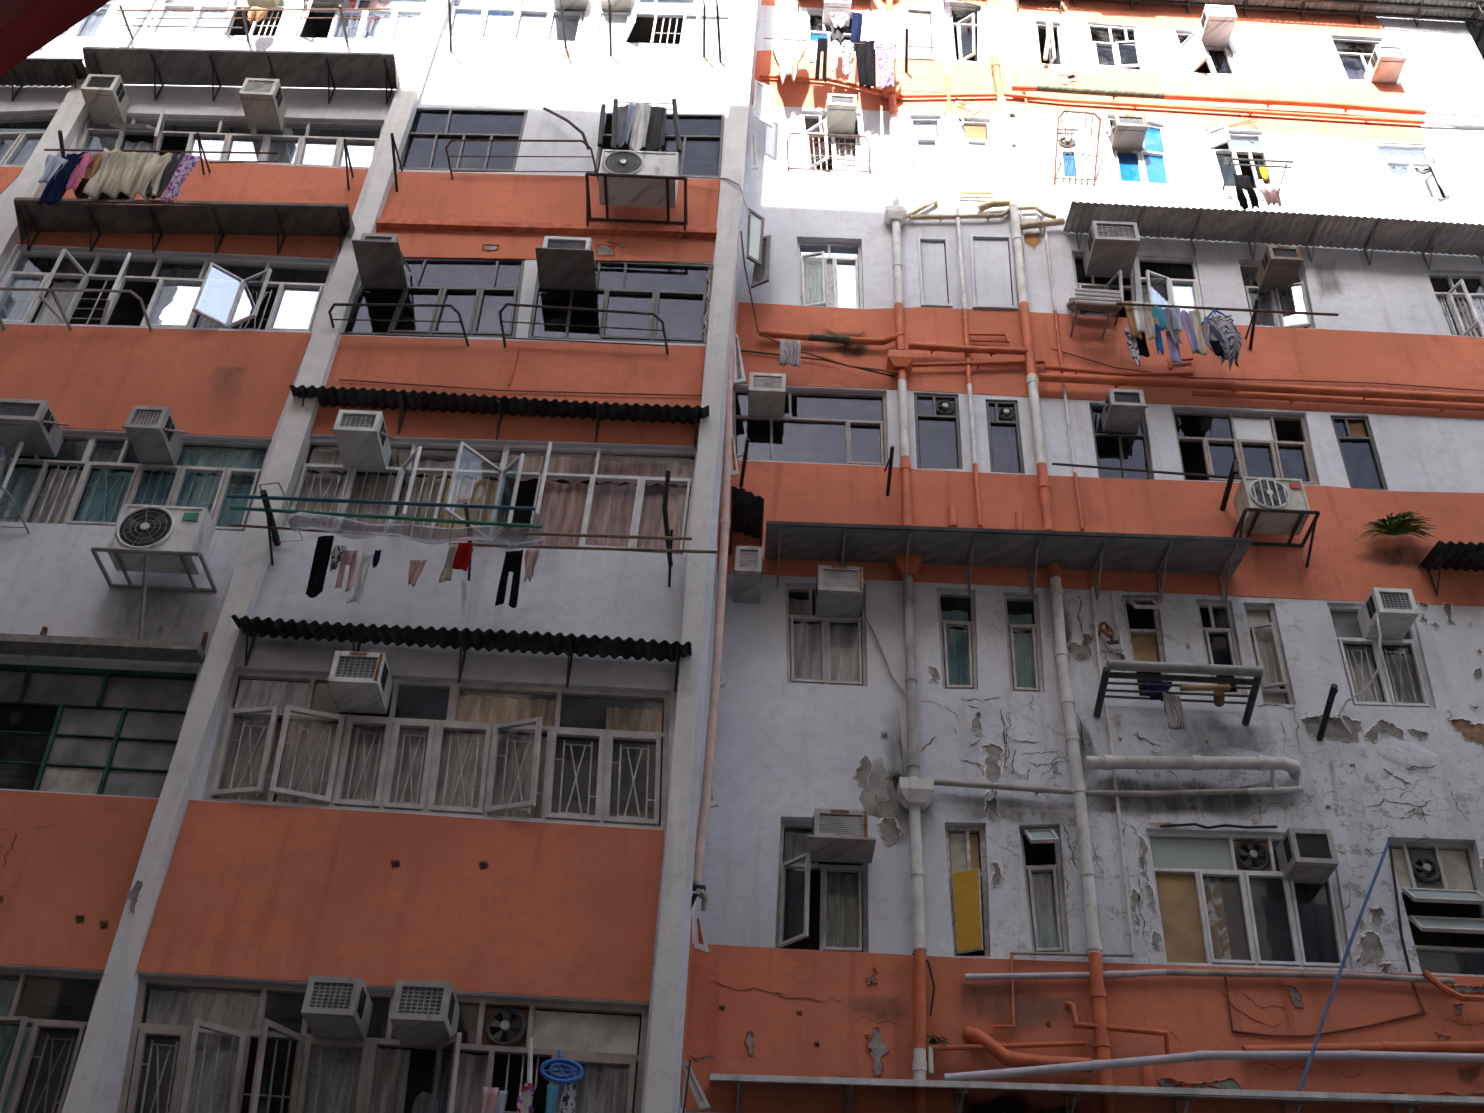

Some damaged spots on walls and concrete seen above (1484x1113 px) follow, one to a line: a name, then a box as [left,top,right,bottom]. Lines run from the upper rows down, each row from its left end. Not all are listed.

peeling [1007,113,1032,173]
crack [1076,594,1094,661]
peeling [1417,601,1474,631]
peeling [1470,648,1484,682]
crack [918,696,1084,780]
peeling [1299,712,1430,744]
flaking render [1446,704,1484,749]
peeling [852,754,873,788]
peeling [876,817,905,847]
peeling [1129,835,1163,951]
peeling [1352,905,1393,974]
crack [699,981,904,1027]